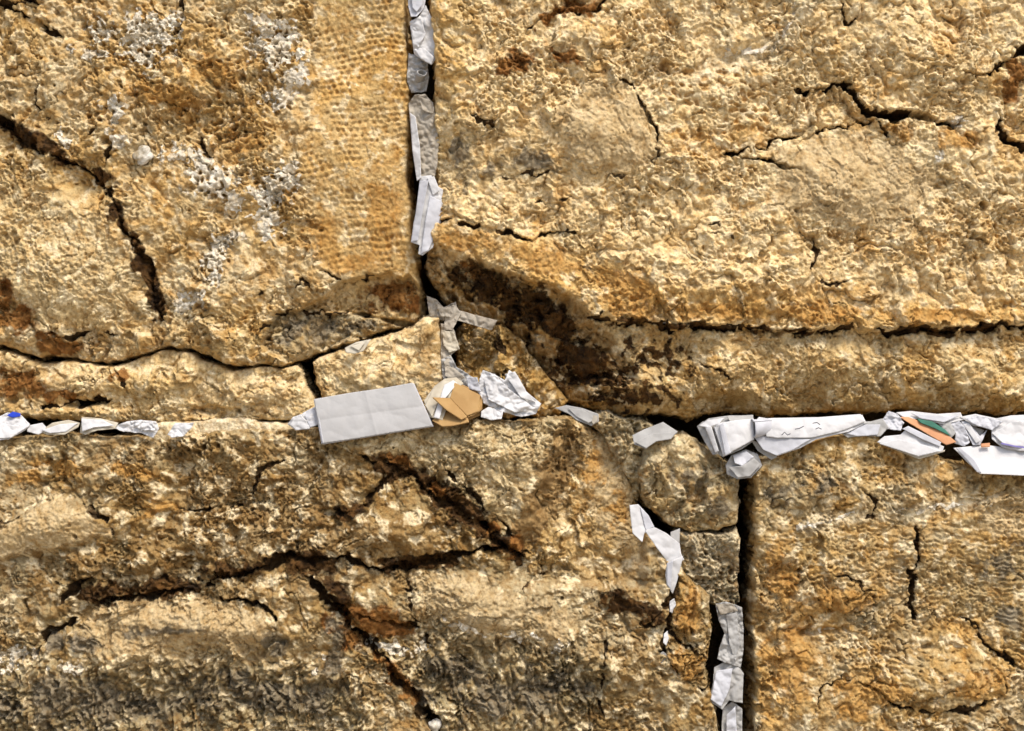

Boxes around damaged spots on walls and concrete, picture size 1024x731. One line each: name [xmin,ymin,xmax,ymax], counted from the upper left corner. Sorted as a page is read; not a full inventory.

crack [986,44,1024,76]
crack [0,115,115,202]
crack [122,230,152,261]
crack [440,218,577,241]
crack [502,169,568,203]
crack [619,78,660,165]
crack [723,81,959,169]
crack [995,117,1024,154]
crack [39,577,160,651]
crack [206,550,441,731]
crack [336,455,545,649]
crack [904,526,921,620]